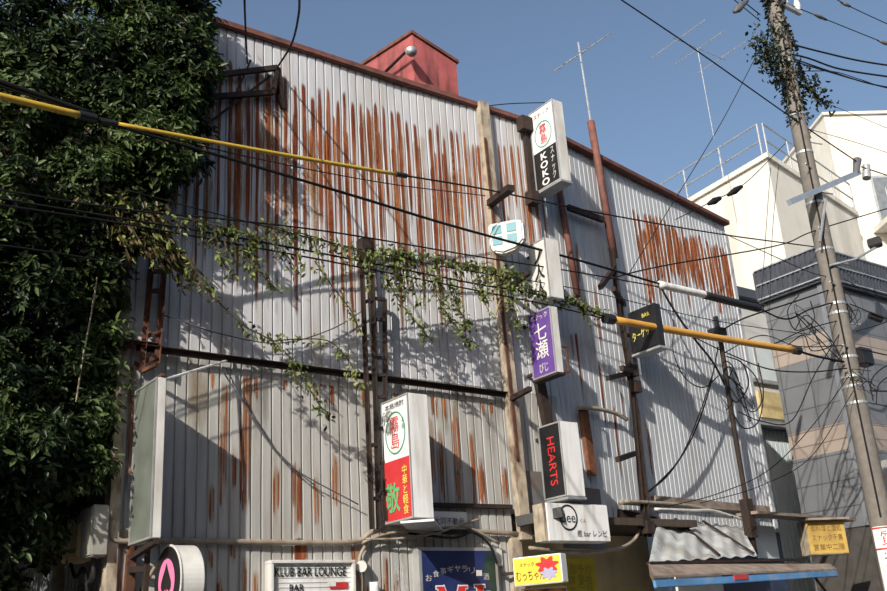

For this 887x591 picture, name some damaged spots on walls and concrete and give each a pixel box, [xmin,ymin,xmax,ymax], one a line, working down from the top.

rust [174,61,489,336]
rust [632,210,734,314]
rust [209,376,257,519]
rust [292,466,301,523]
rust [431,396,486,504]
rust [291,538,307,560]